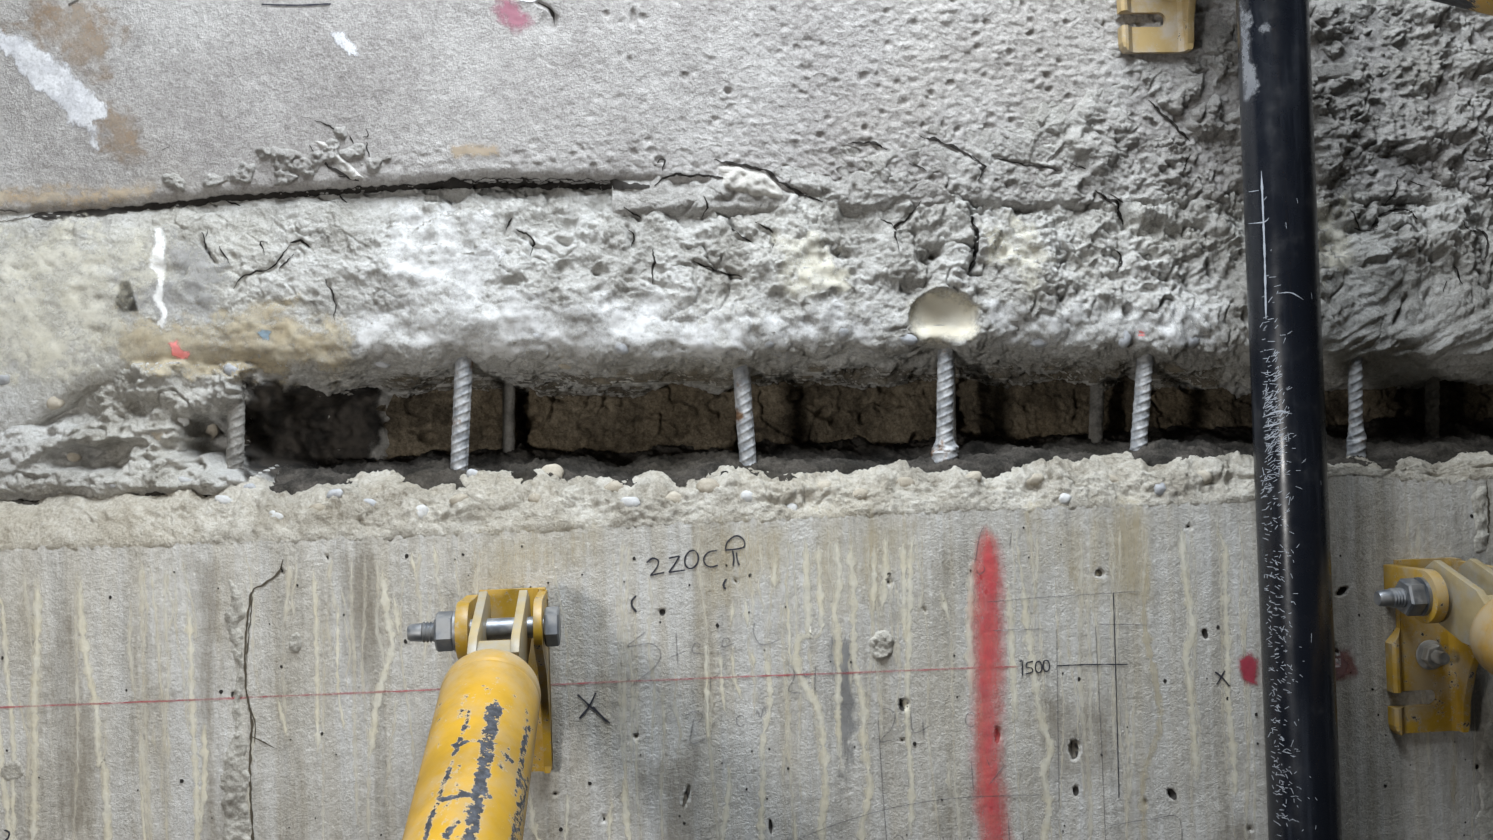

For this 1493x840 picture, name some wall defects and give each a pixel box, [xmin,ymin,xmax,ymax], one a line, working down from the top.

crack [0,121,823,320]
crack [848,136,1124,273]
crack [1148,100,1191,171]
crack [1350,179,1424,232]
spalling [0,362,1255,552]
spalling [1327,451,1493,485]
damp [0,580,43,840]
damp [74,582,112,840]
crack [243,559,283,840]
damp [284,548,480,835]
damp [703,535,960,840]
damp [1006,535,1145,840]